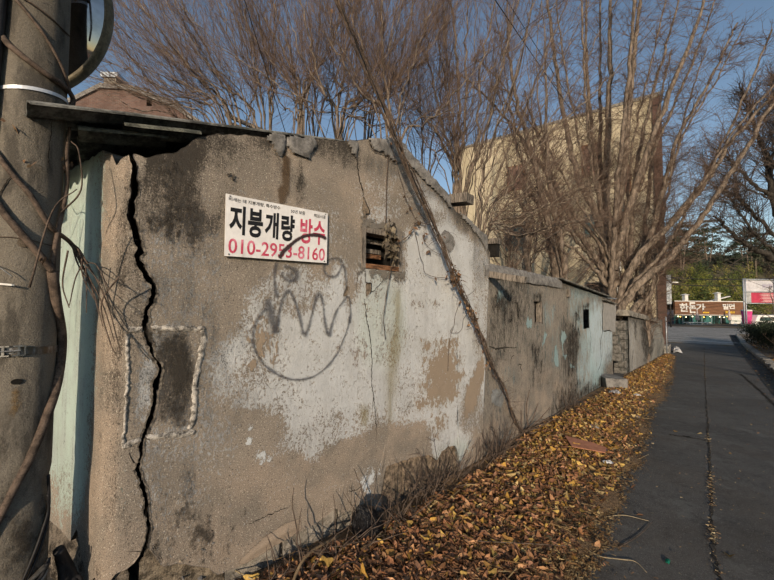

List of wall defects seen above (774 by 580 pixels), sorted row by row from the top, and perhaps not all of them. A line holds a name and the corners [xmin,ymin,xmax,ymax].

crack [348,142,395,196]
crack [125,158,165,580]
leakage [142,328,193,428]
peeling [238,314,289,376]
crack [356,273,383,433]
spalling [139,331,487,580]
spalling [48,520,95,580]
spalling [111,568,129,580]